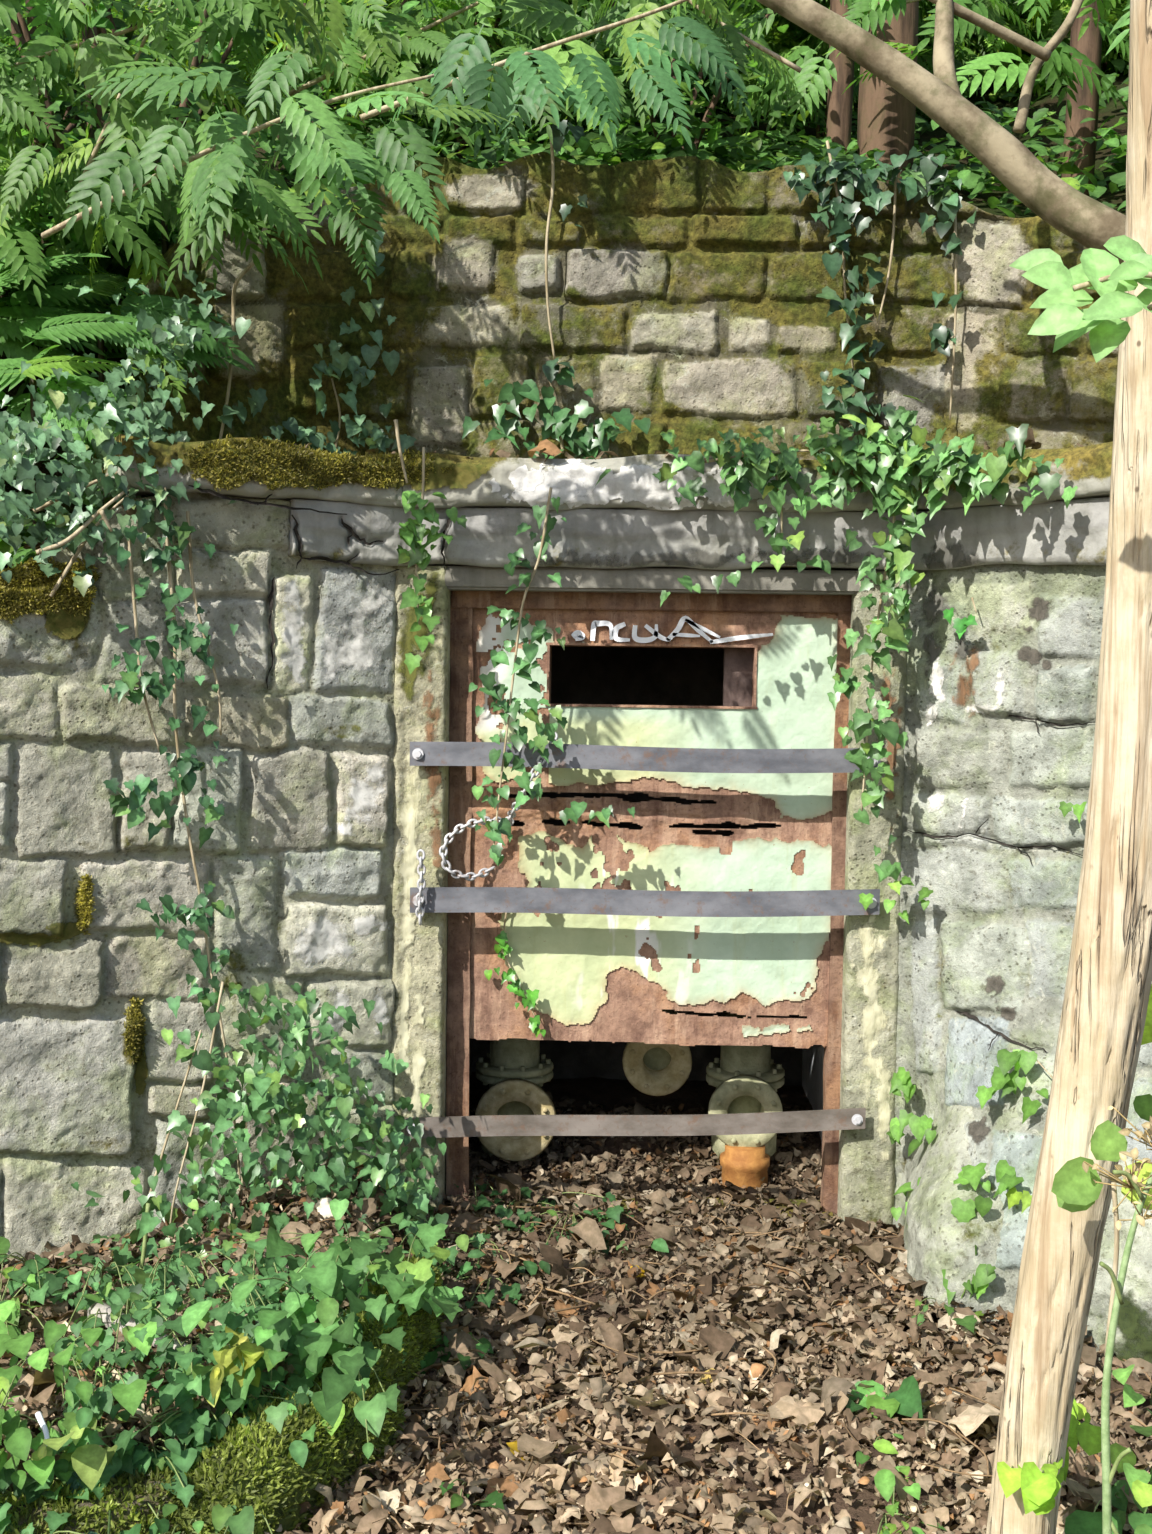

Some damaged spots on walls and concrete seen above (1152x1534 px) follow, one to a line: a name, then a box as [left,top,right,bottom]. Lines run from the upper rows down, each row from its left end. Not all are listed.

crack [188,485,399,689]
crack [905,819,1083,866]